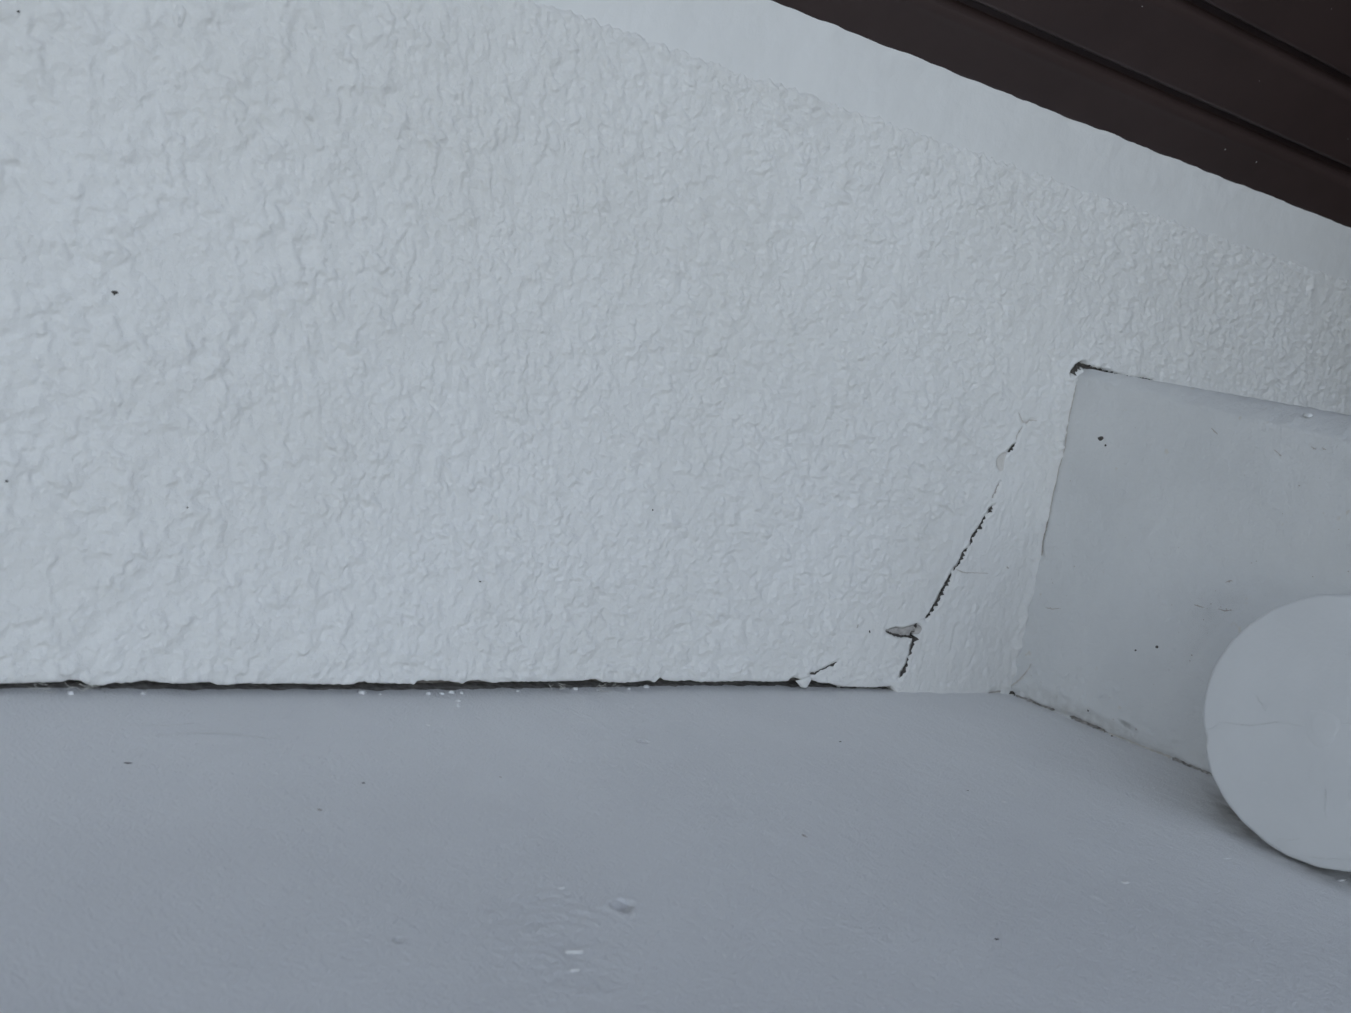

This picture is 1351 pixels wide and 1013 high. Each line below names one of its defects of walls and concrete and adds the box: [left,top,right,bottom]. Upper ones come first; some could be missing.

crack [1008,362,1152,556]
spalling [885,623,922,638]
crack [899,483,1009,678]